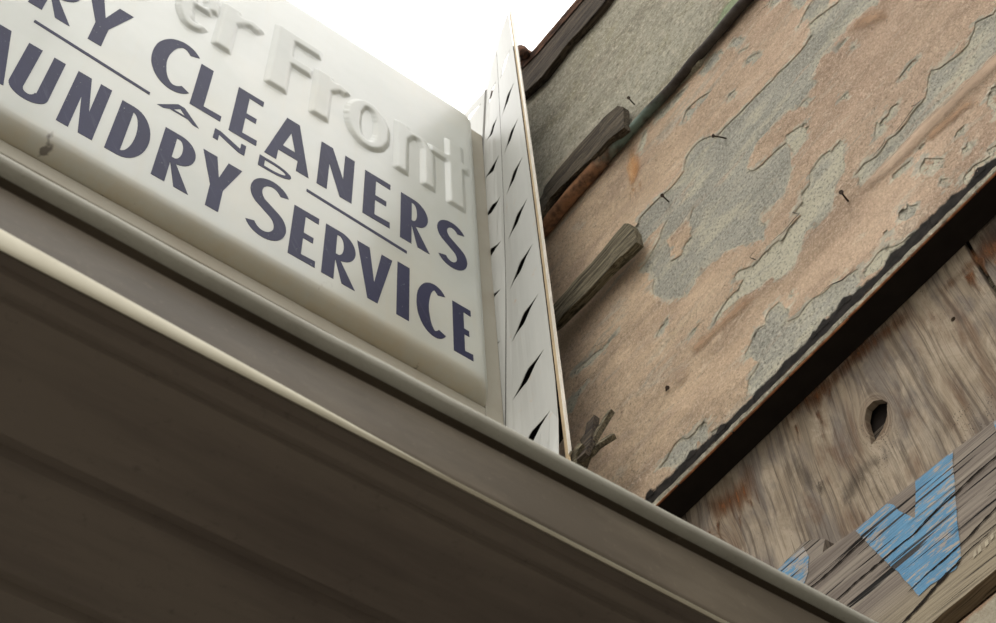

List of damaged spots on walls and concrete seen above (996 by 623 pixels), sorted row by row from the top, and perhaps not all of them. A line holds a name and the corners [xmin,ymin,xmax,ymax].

peeling [635,0,879,322]
peeling [897,201,917,221]
peeling [856,11,996,188]
peeling [745,230,908,396]
peeling [660,418,717,468]
crack [810,524,876,587]
crack [836,456,996,601]
crack [902,507,996,623]